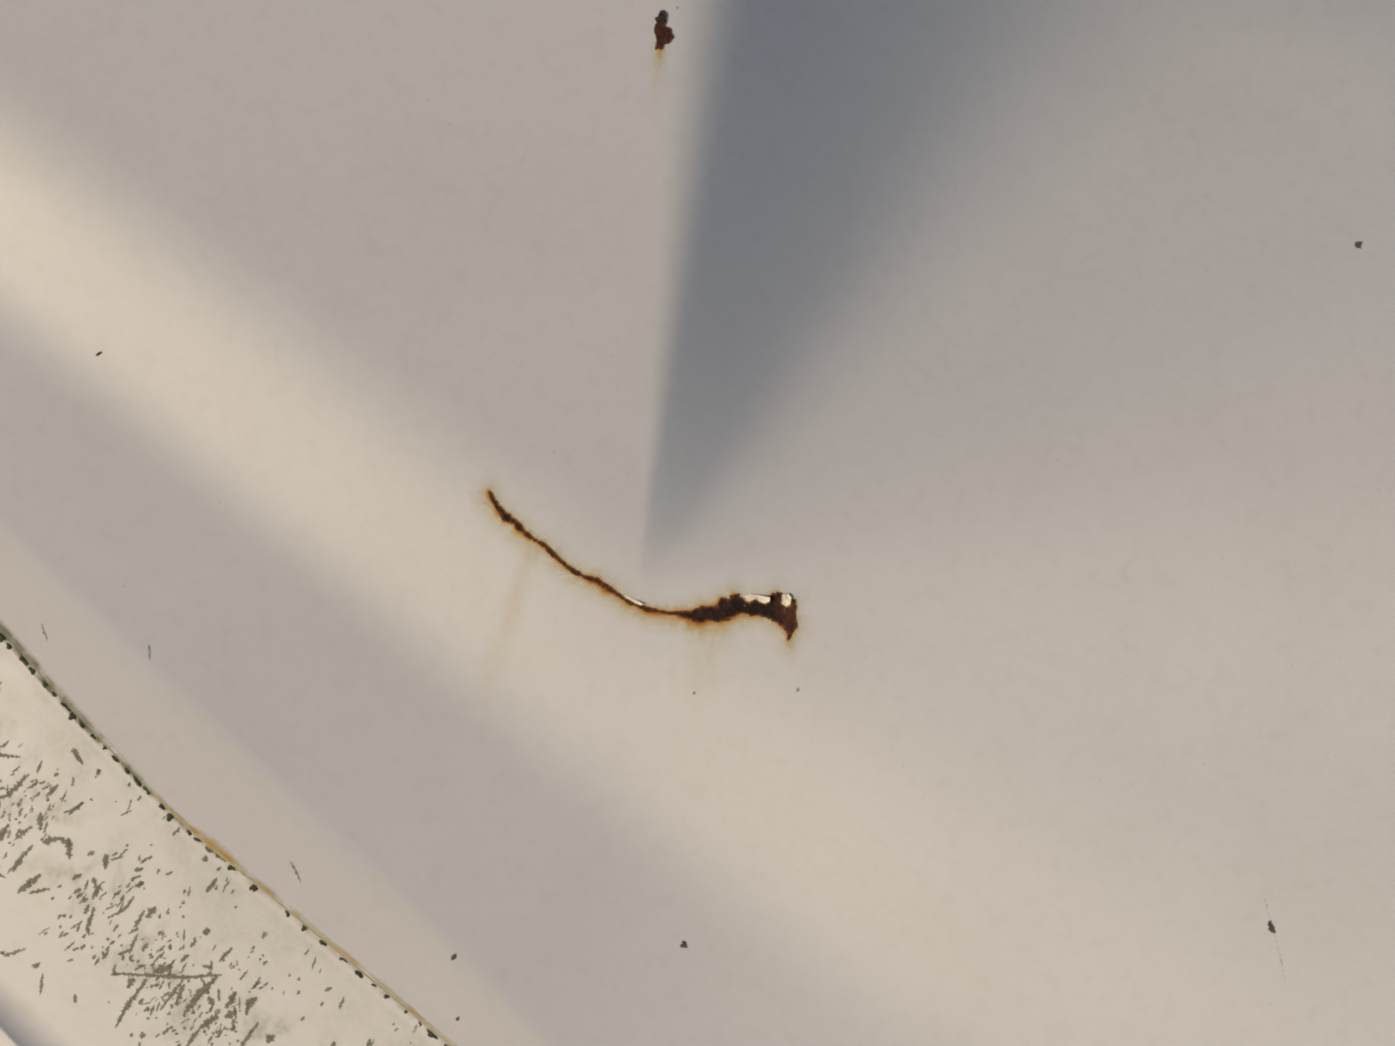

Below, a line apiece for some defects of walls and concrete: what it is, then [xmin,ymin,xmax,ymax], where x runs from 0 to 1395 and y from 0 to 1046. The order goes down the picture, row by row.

rust [654,10,674,60]